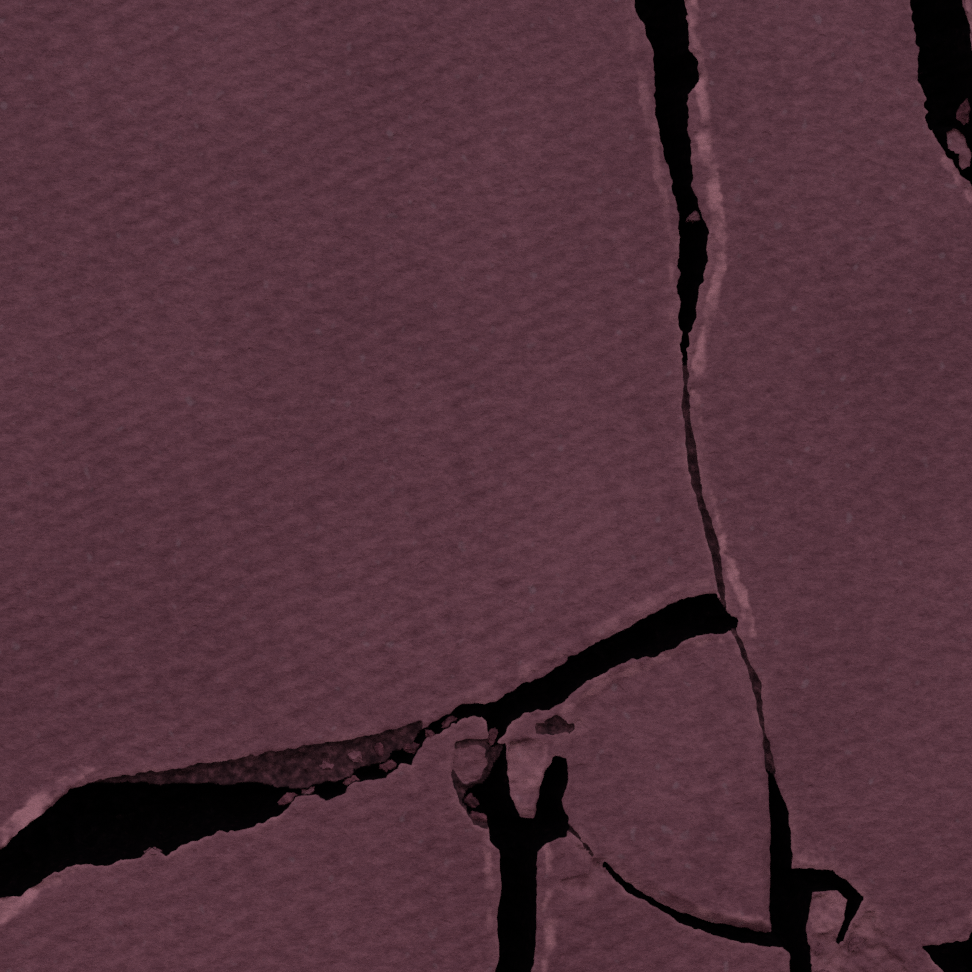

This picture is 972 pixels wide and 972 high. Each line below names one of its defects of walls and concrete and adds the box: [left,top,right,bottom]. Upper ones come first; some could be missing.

crack [910,0,972,204]
crack [621,0,759,651]
crack [0,576,909,972]
crack [922,910,972,972]